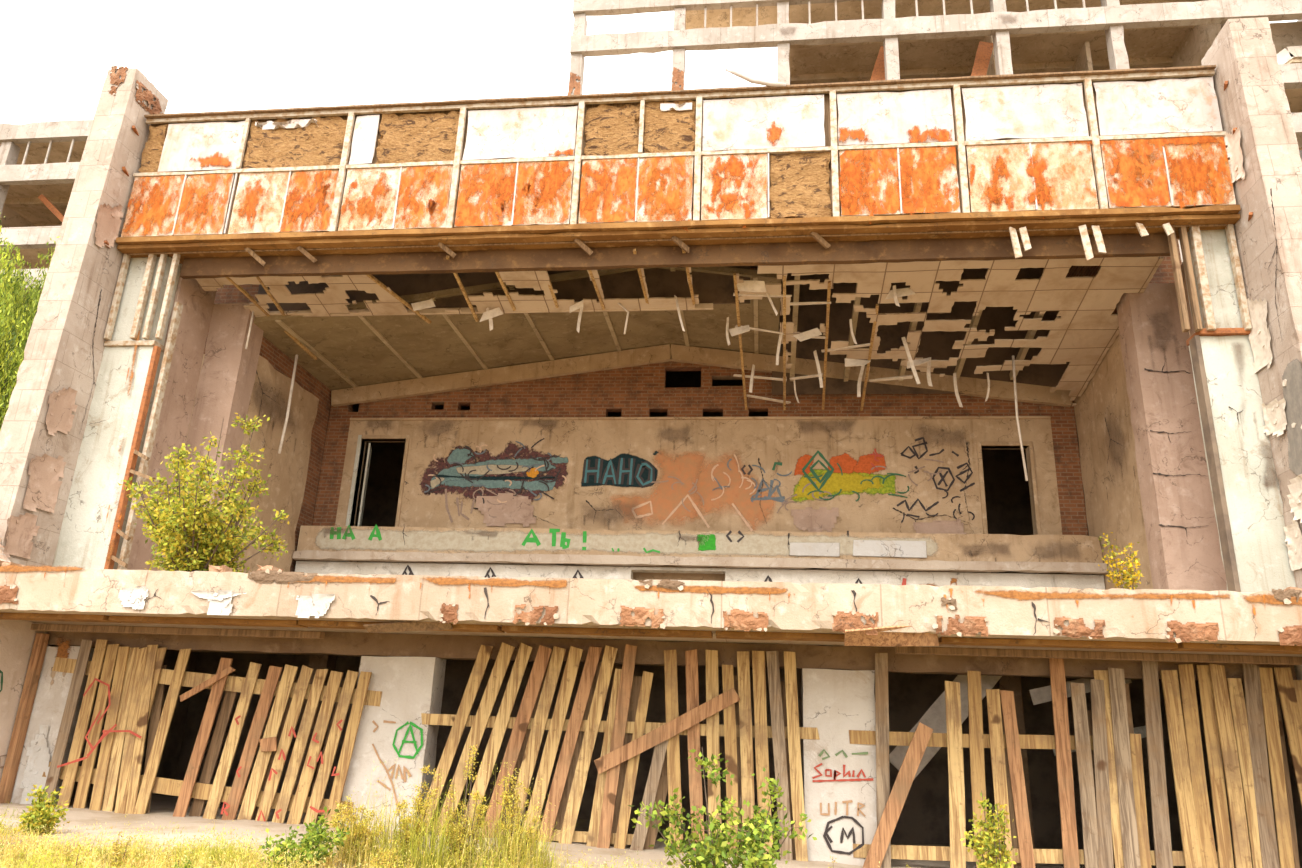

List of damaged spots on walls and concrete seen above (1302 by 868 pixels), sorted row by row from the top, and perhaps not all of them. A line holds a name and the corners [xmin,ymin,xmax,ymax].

spalling [108,65,163,114]
rust [122,122,782,236]
flaking render [1247,298,1302,571]
flaking render [3,454,67,559]
spalling [0,584,19,604]
spalling [1272,589,1302,604]
spalling [620,606,666,629]
spalling [723,609,768,632]
spalling [831,611,878,635]
spalling [932,597,988,637]
spalling [1166,620,1219,643]
spalling [1277,625,1302,646]